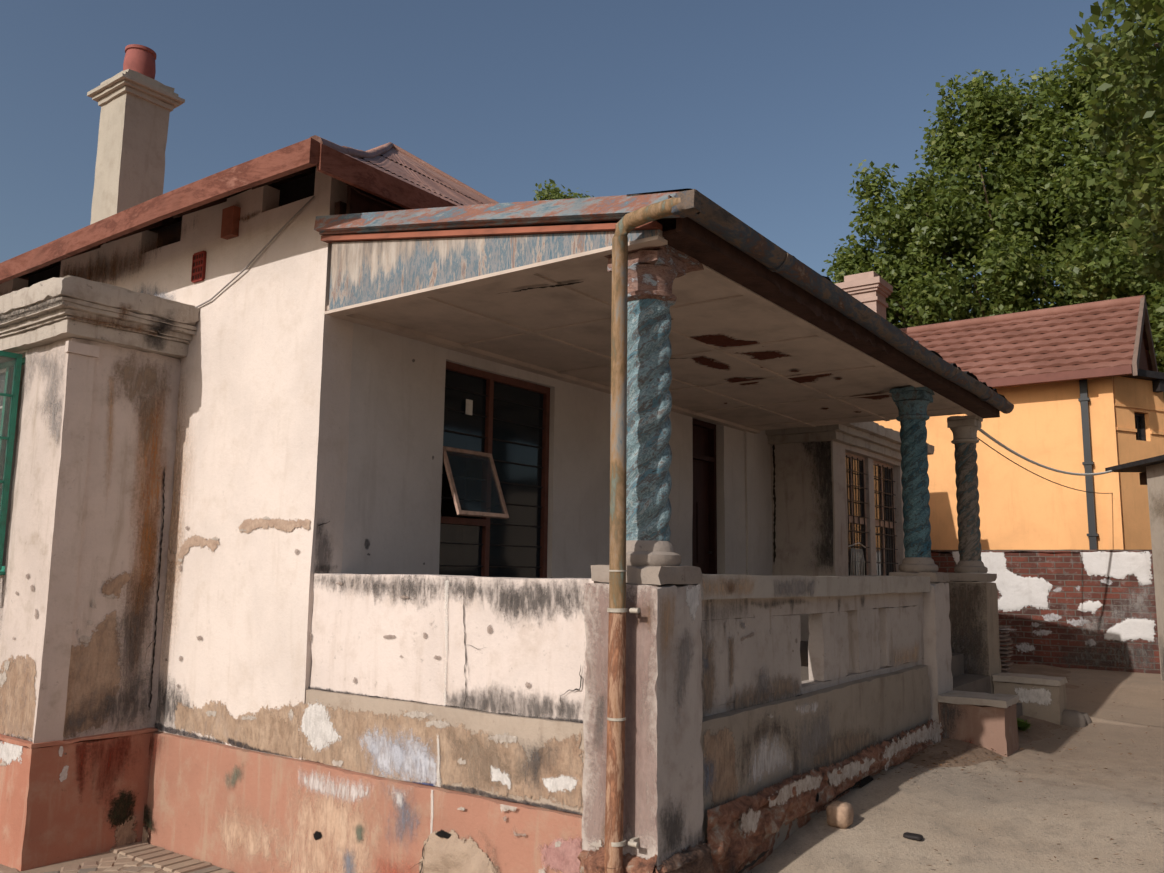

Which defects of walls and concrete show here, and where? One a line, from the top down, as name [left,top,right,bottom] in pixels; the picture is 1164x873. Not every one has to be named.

leakage [114,356,167,450]
peeling [167,526,221,572]
peeling [239,516,310,533]
leakage [947,582,986,675]
peeling [981,551,1156,653]
leakage [308,524,609,845]
leakage [623,586,702,851]
peeling [174,700,527,873]
flaking render [623,719,944,873]
peeling [538,827,605,873]